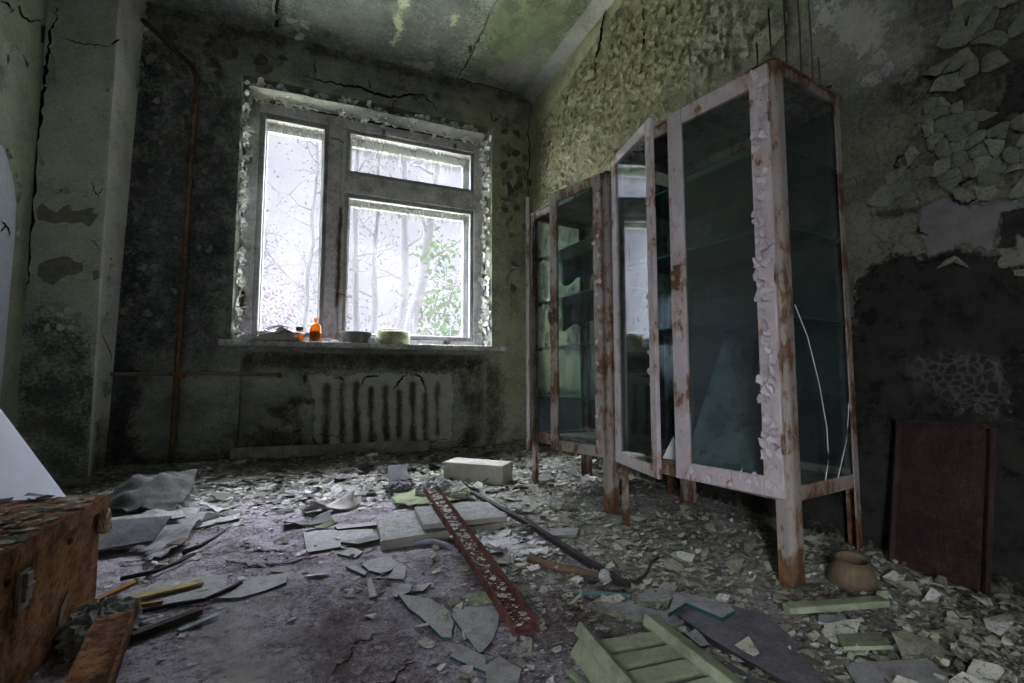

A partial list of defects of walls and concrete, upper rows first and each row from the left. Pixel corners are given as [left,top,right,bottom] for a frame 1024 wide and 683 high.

flaking render [798,0,909,100]
crack [0,0,120,290]
peeling [36,204,98,227]
crack [249,60,531,197]
peeling [232,0,741,361]
peeling [867,0,1024,276]
crack [334,373,427,394]
damp [627,379,675,439]
damp [693,376,763,455]
damp [797,386,844,467]
damp [851,248,1024,597]
damp [696,482,776,518]